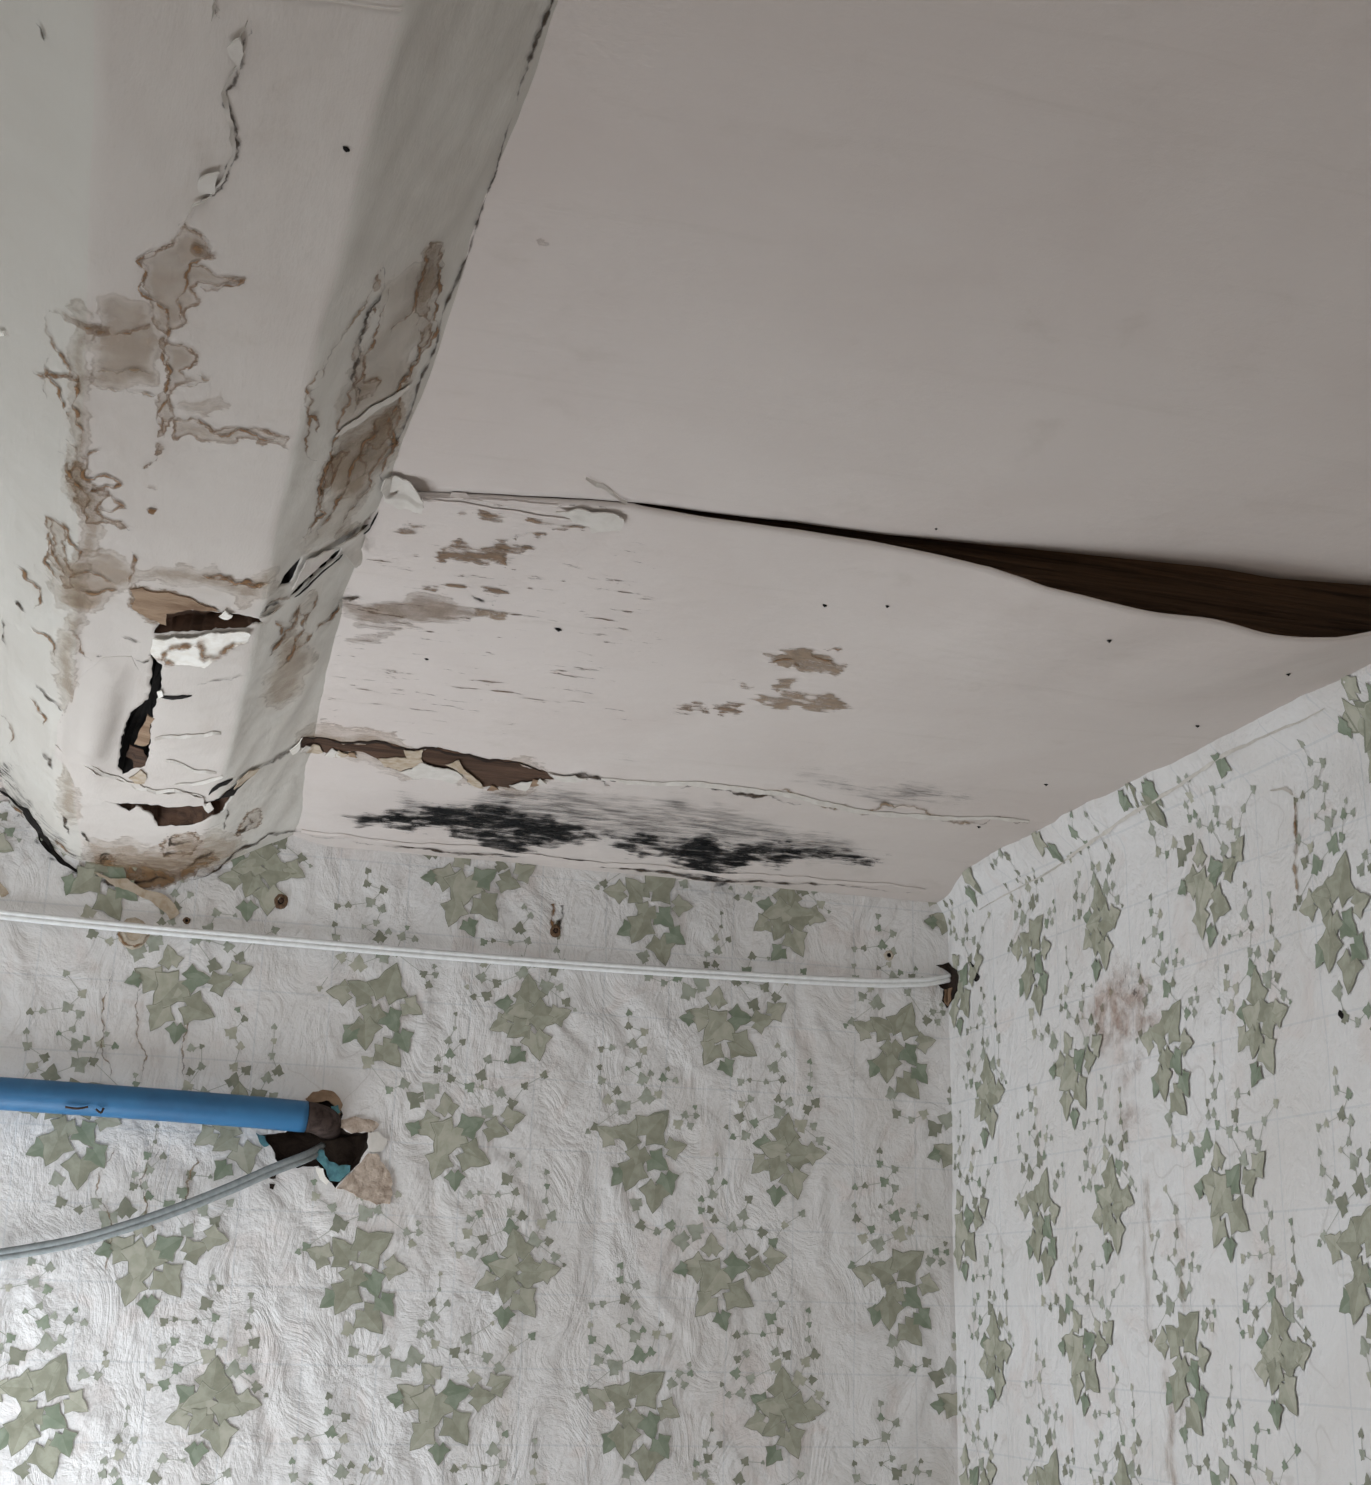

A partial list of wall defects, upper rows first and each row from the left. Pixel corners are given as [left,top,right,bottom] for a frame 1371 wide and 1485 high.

crack [518,0,554,94]
crack [185,0,248,222]
crack [398,131,507,439]
peeling [381,475,628,594]
peeling [130,587,233,625]
damp [475,609,506,620]
peeling [387,669,544,712]
peeling [289,737,606,791]
damp [343,793,878,886]
spalling [256,1090,393,1205]